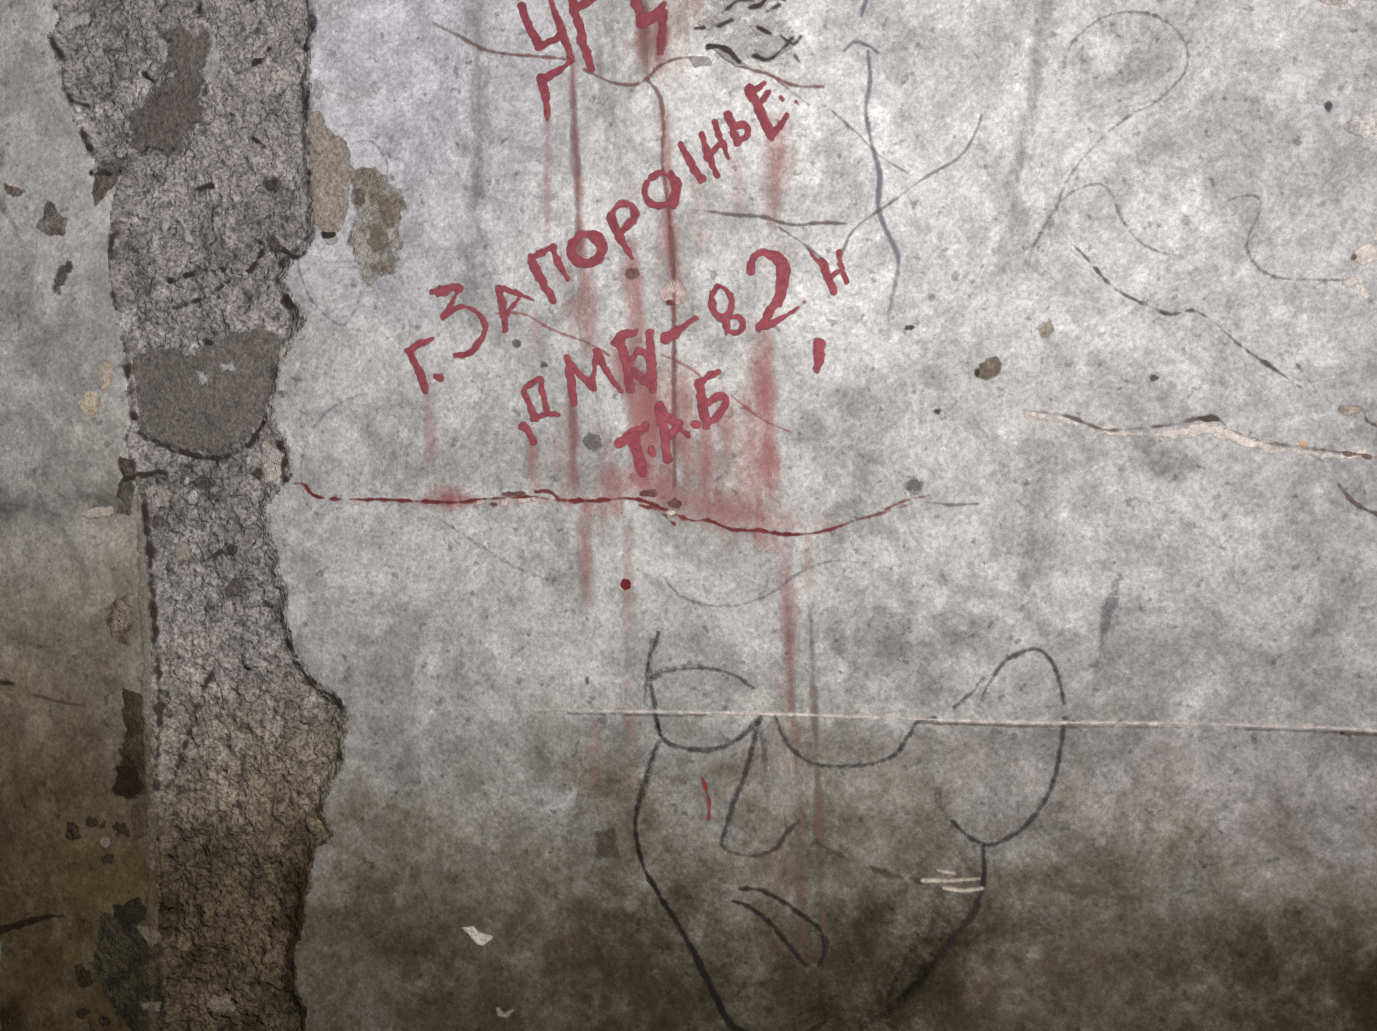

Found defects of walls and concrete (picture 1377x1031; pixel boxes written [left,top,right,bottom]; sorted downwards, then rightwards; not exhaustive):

spalling [37,201,68,235]
crack [295,0,905,536]
crack [1077,248,1203,315]
crack [1236,342,1279,372]
crack [1024,405,1377,516]
spalling [47,0,406,1031]
leakage [596,829,618,858]